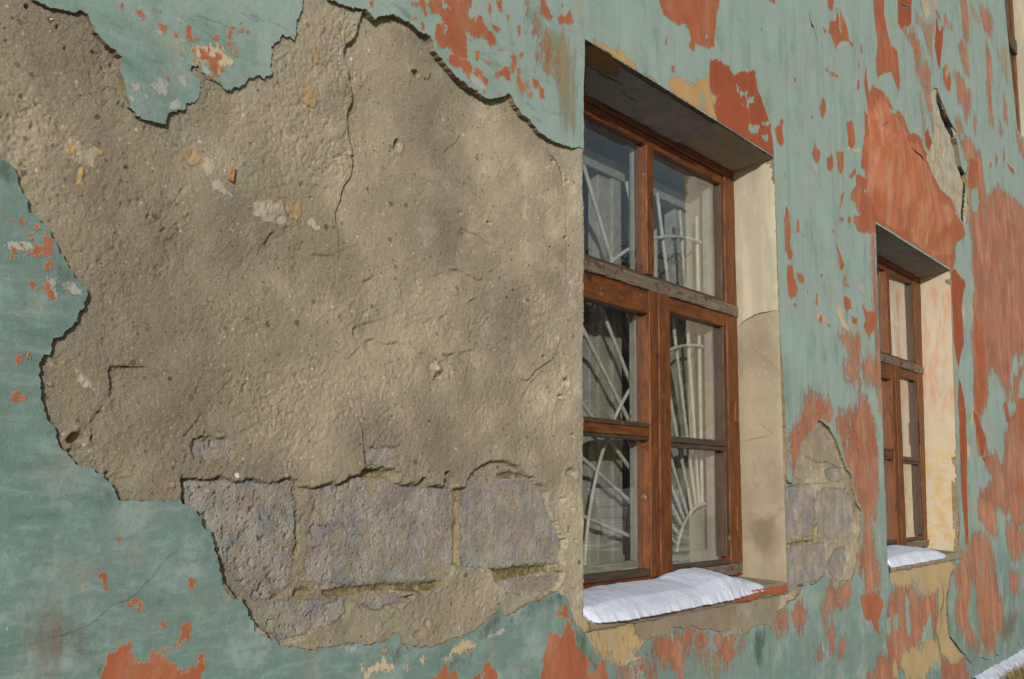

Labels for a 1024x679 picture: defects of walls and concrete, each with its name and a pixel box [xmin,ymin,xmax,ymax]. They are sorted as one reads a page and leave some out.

peeling [411,0,545,99]
peeling [517,0,574,84]
peeling [659,0,784,156]
peeling [823,0,853,51]
peeling [827,150,844,174]
peeling [42,275,83,304]
peeling [784,206,830,327]
peeling [834,0,1024,679]
peeling [95,619,206,679]
peeling [361,647,395,679]
peeling [431,638,478,679]
peeling [472,660,498,679]